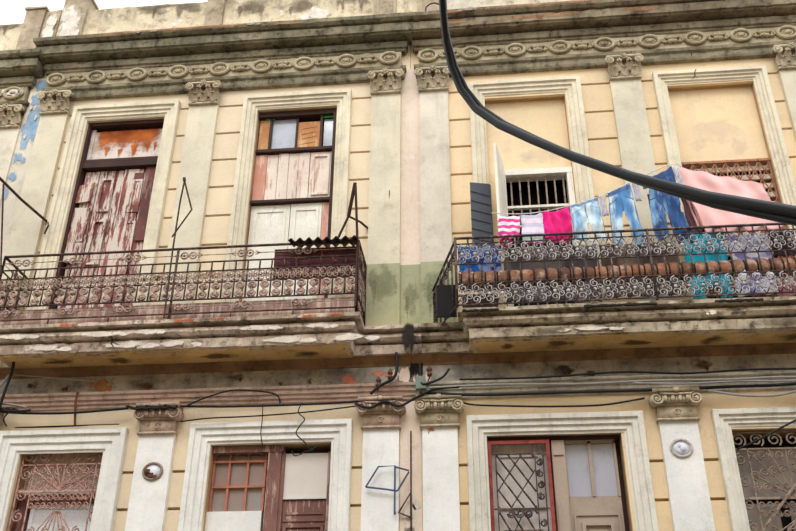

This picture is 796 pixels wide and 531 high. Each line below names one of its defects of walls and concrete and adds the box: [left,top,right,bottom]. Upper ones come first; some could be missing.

damp [238,2,264,15]
damp [289,0,311,14]
flaking render [42,5,81,37]
peeling [1,80,47,200]
spalling [0,334,71,351]
spalling [80,329,202,348]